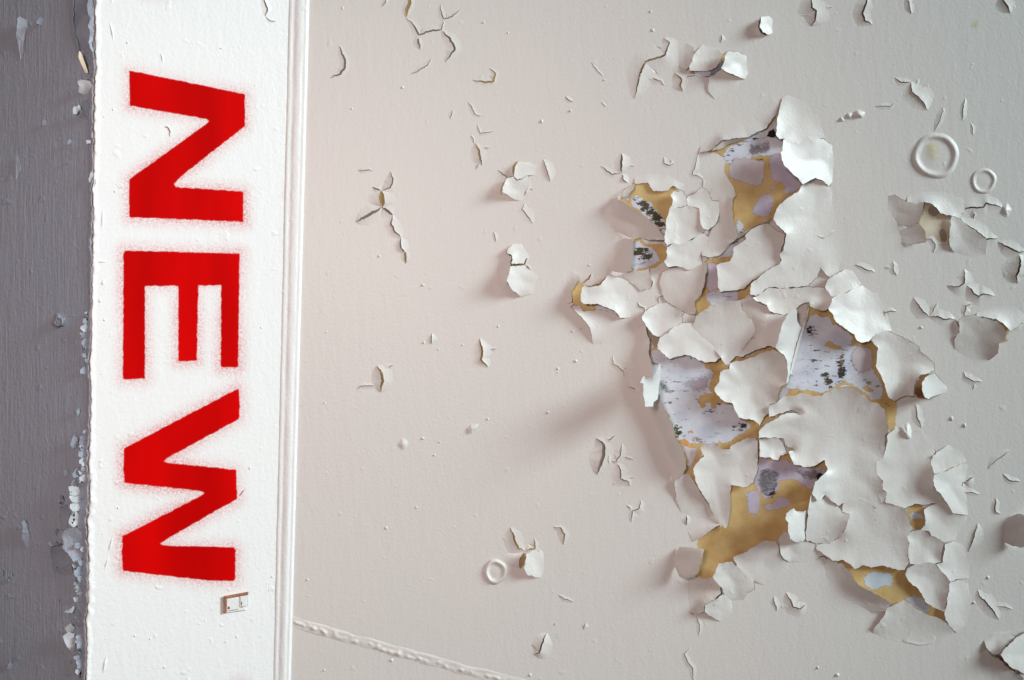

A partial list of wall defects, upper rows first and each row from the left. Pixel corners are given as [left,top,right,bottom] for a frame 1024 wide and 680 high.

crack [381,0,462,75]
peeling [679,43,748,100]
crack [355,166,411,264]
peeling [888,191,987,257]
peeling [561,95,972,644]
peeling [48,429,87,678]
peeling [980,631,1024,680]